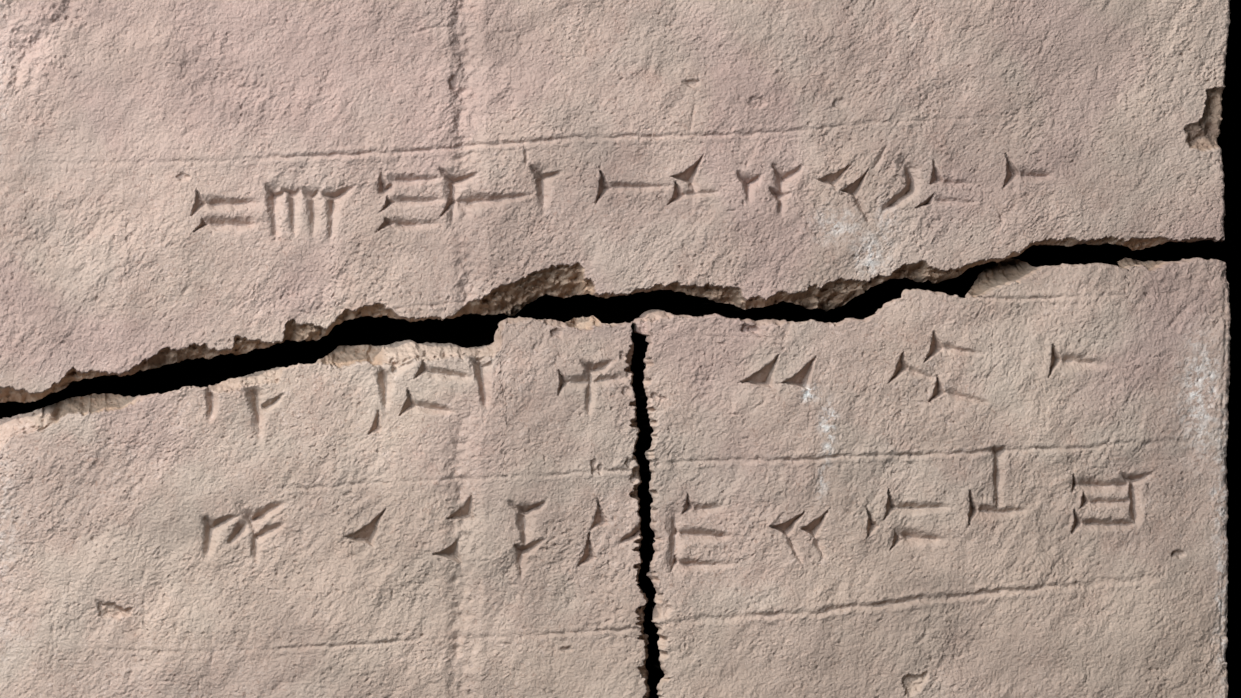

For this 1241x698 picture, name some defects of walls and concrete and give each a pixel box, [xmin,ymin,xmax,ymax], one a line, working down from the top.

crack [0,246,1189,419]